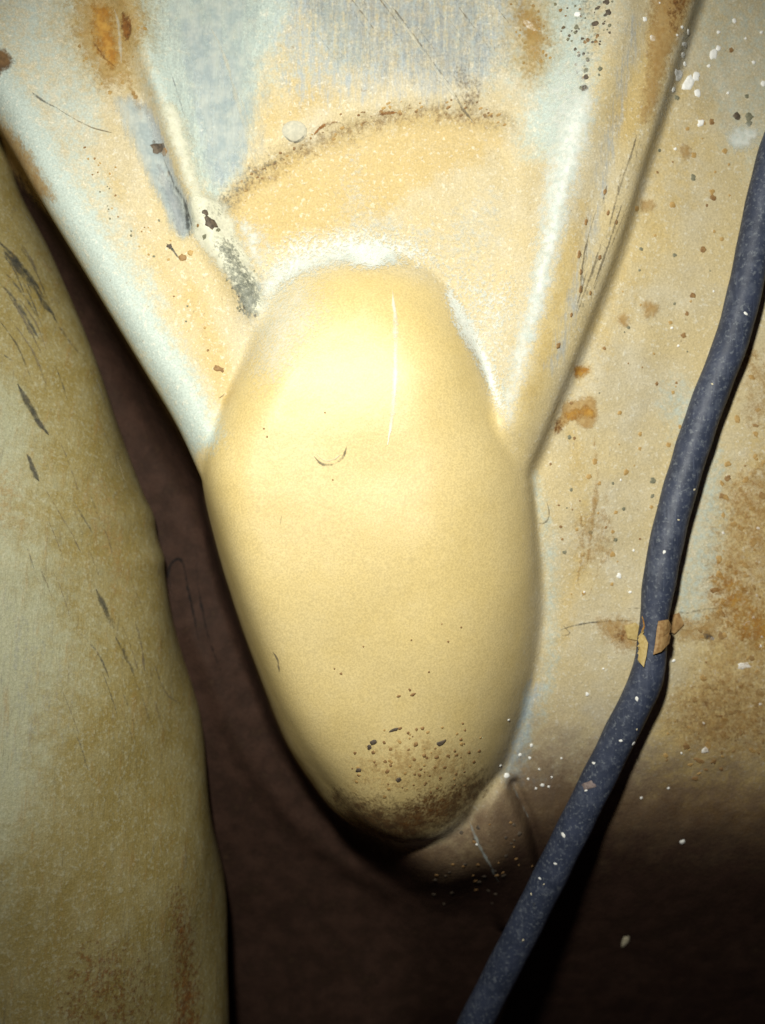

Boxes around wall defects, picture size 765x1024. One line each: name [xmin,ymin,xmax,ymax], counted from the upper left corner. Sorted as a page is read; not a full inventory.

corrosion [77,0,147,110]
corrosion [515,4,552,64]
mould [219,239,264,317]
corrosion [555,392,600,440]
corrosion [574,366,589,377]
corrosion [558,458,618,563]
corrosion [667,454,765,781]
corrosion [333,722,485,843]